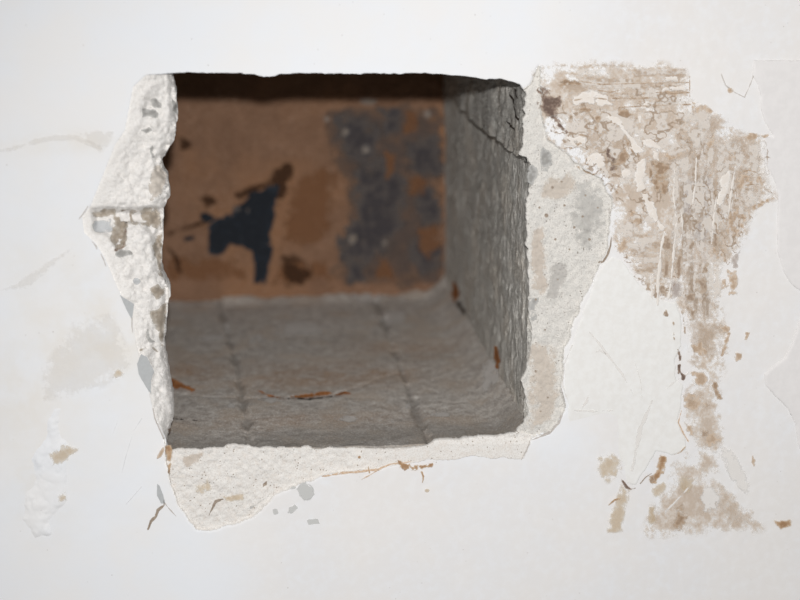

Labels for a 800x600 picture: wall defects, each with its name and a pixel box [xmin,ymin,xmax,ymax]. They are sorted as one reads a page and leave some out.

damp [51,445,76,464]
corrosion [398,460,433,492]
flaking render [82,60,800,531]
damp [533,64,774,536]